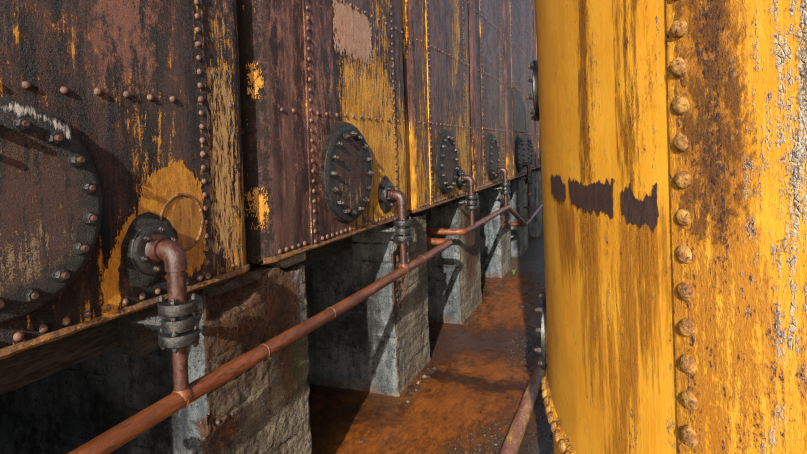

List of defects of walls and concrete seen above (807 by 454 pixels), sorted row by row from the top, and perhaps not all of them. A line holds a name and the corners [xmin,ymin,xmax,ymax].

rust [578,0,591,185]
rust [612,0,645,201]
rust [673,0,757,245]
rust [310,273,543,454]
rust [556,199,670,454]